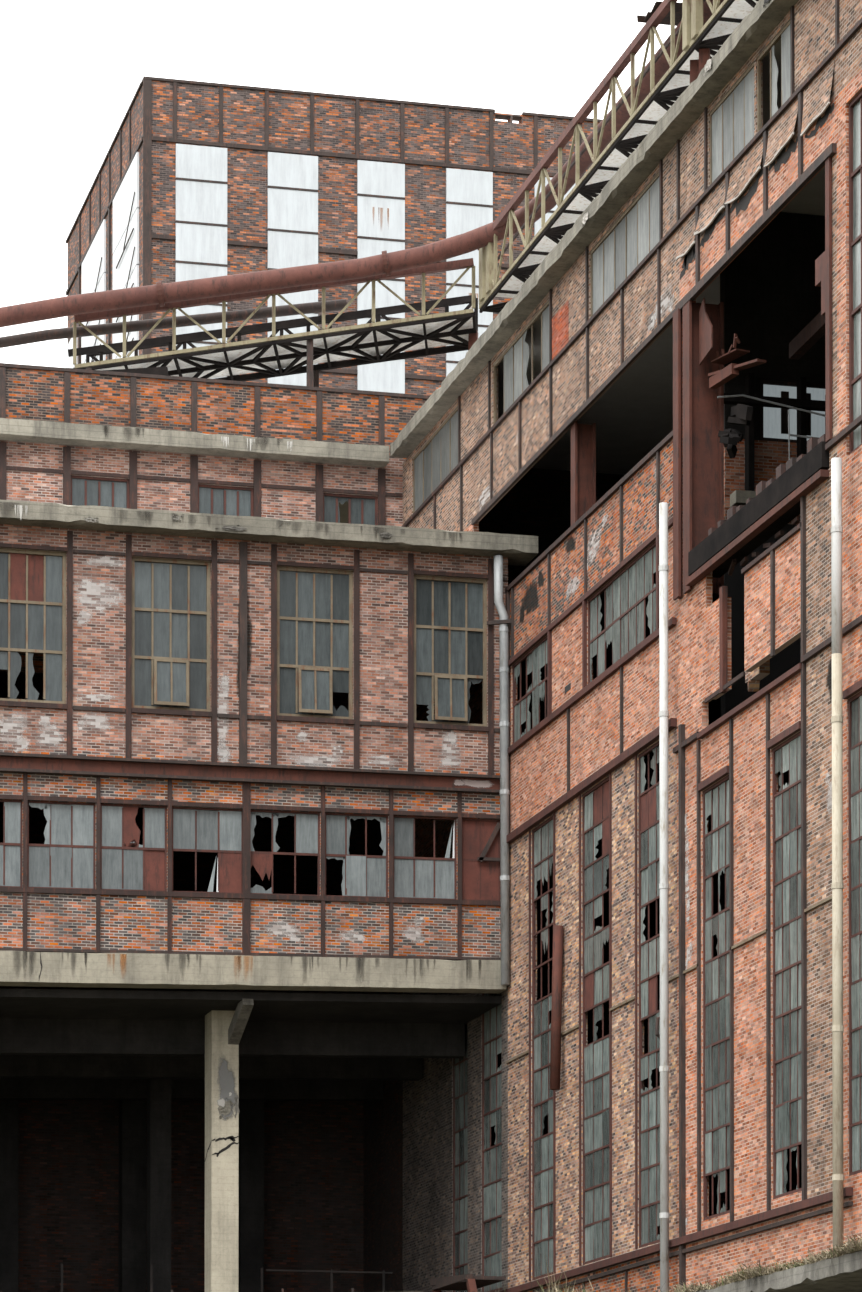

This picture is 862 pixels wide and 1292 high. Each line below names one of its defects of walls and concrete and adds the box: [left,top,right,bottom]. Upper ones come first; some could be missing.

damp [89,556,122,566]
damp [77,580,122,624]
damp [77,694,115,730]
damp [0,715,62,752]
damp [268,921,307,971]
spalling [218,1094,240,1119]
crack [204,1136,239,1163]